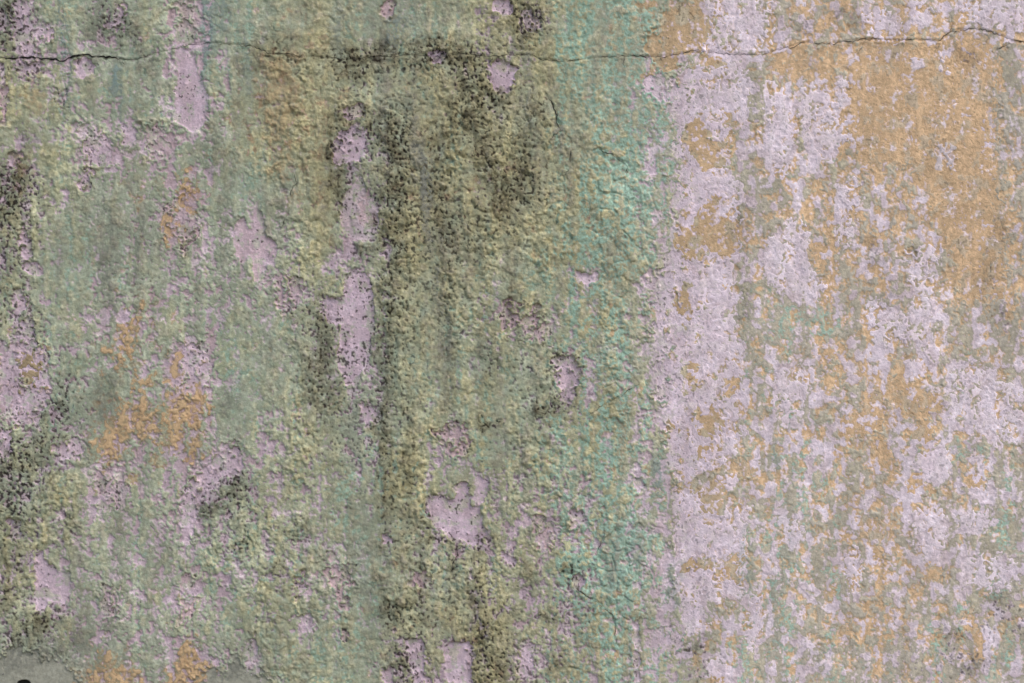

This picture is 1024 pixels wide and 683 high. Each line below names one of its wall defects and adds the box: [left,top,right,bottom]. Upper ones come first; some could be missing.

peeling [70,0,209,193]
water stain [343,19,507,158]
peeling [486,58,519,95]
crack [1,26,1024,67]
peeling [330,102,379,240]
water stain [364,107,407,203]
peeling [233,210,277,286]
peeling [319,270,376,387]
peeling [550,355,584,403]
peeling [640,0,1024,662]
peeling [425,476,488,548]
peeling [700,657,727,683]